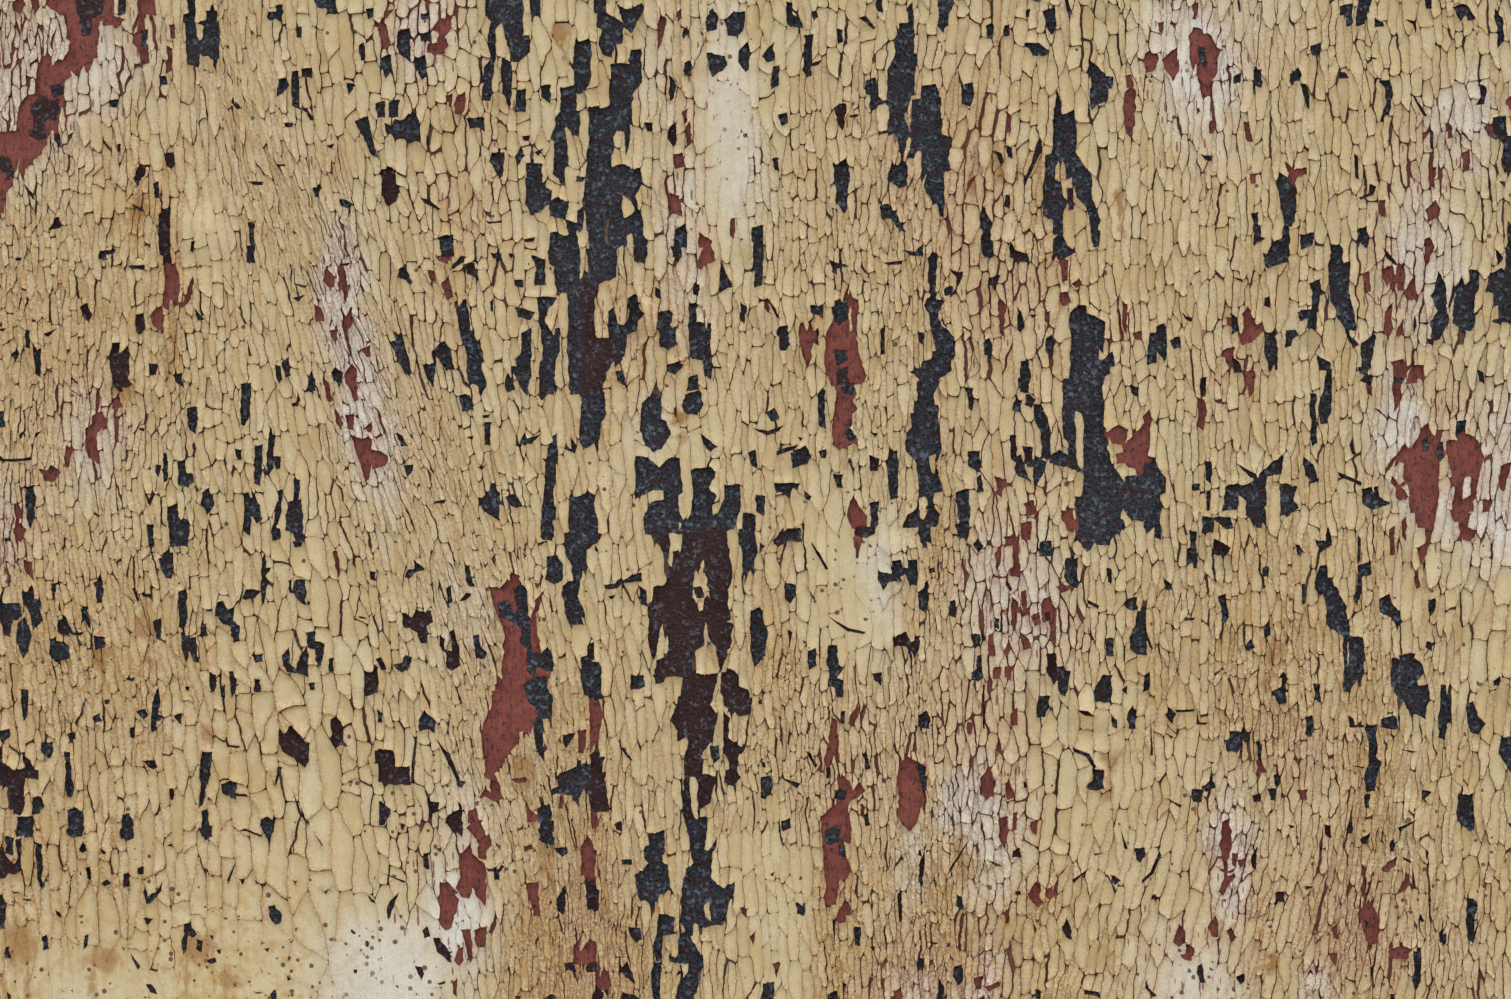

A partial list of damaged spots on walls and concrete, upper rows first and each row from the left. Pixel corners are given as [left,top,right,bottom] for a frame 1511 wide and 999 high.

peeling [0,0,224,216]
peeling [267,0,340,124]
crack [993,128,1044,185]
crack [1300,58,1376,109]
peeling [0,163,464,833]
peeling [345,0,1511,999]
crack [788,544,865,644]
crack [438,741,460,780]
crack [1073,710,1096,769]
peeling [191,722,297,952]
crack [205,767,323,886]
crack [1058,831,1161,883]